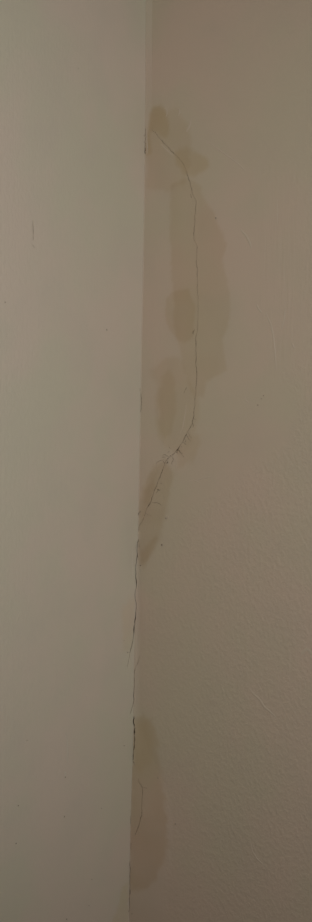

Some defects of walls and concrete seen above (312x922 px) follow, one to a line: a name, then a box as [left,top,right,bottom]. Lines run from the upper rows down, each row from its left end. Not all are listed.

damp [137,99,233,574]
damp [109,710,173,922]
crack [127,362,197,834]